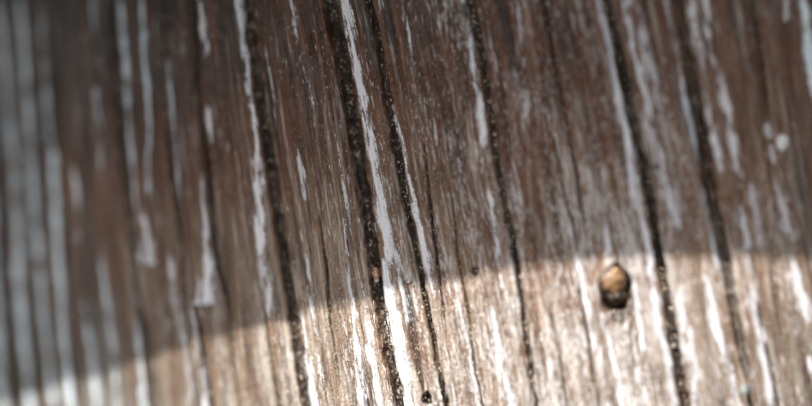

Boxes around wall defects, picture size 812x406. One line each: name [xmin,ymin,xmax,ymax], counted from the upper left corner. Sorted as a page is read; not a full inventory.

crack [243,0,311,406]
crack [318,0,404,406]
crack [367,0,484,406]
crack [603,0,690,406]